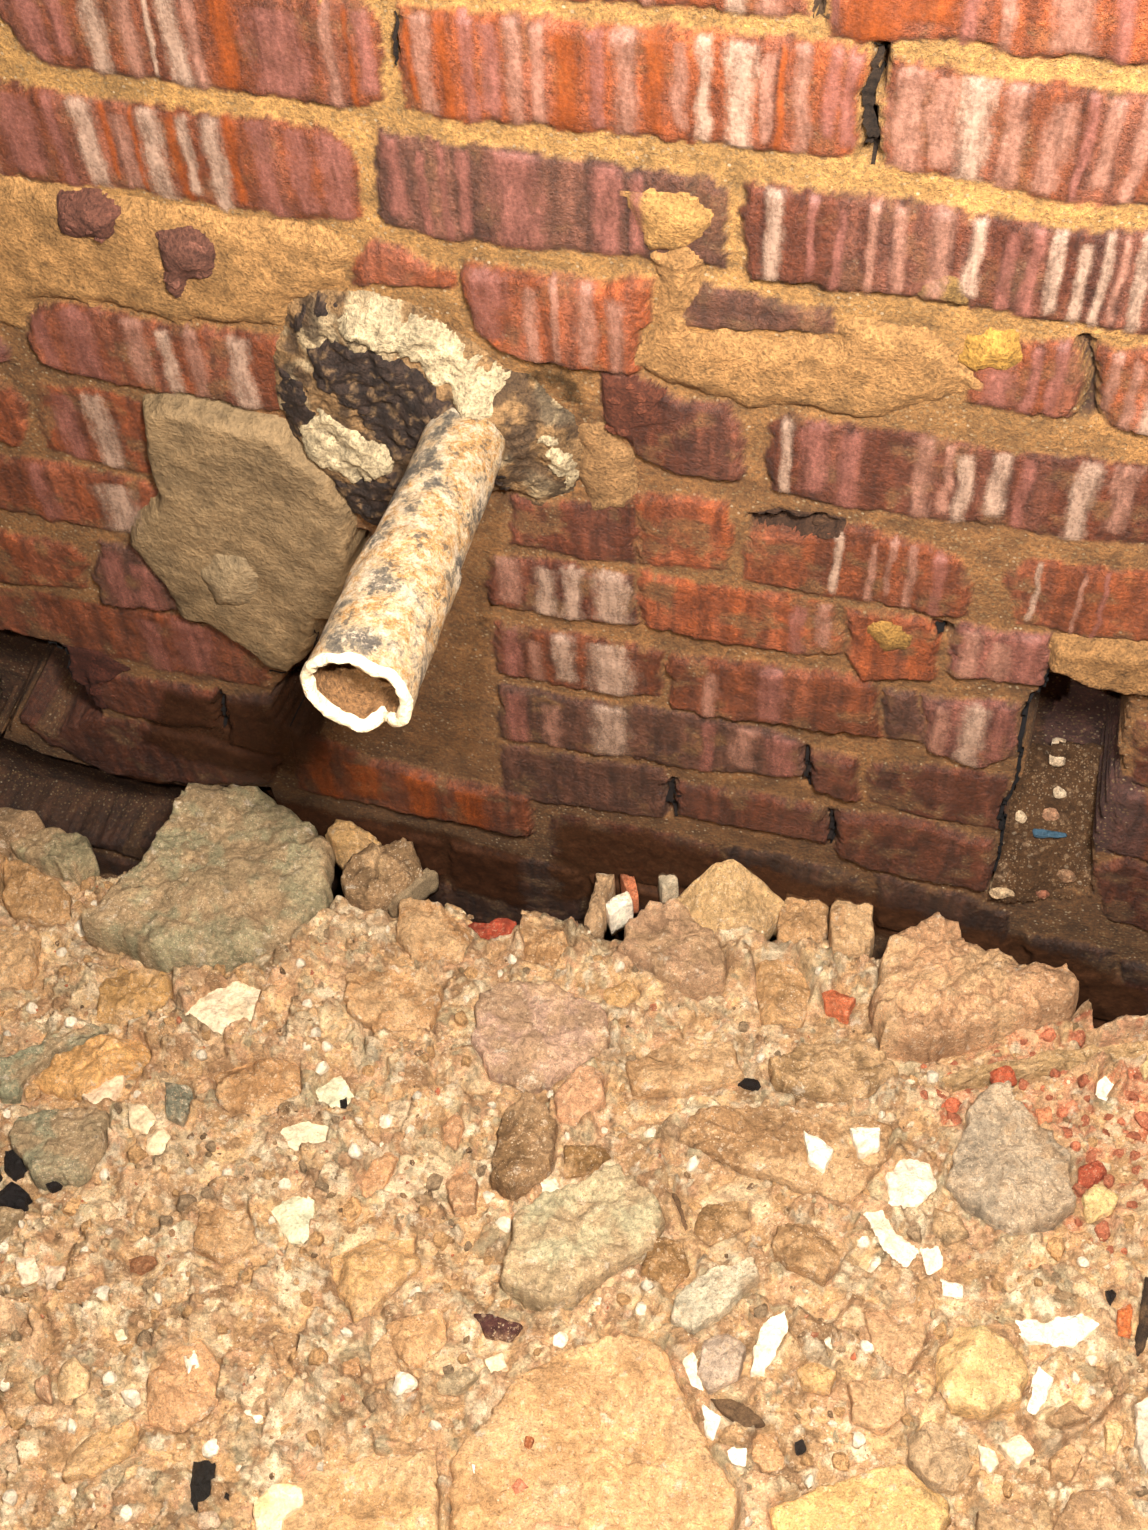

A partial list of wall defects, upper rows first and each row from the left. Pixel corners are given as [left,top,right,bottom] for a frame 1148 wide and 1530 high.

crack [861,42,887,164]
spalling [62,644,131,709]